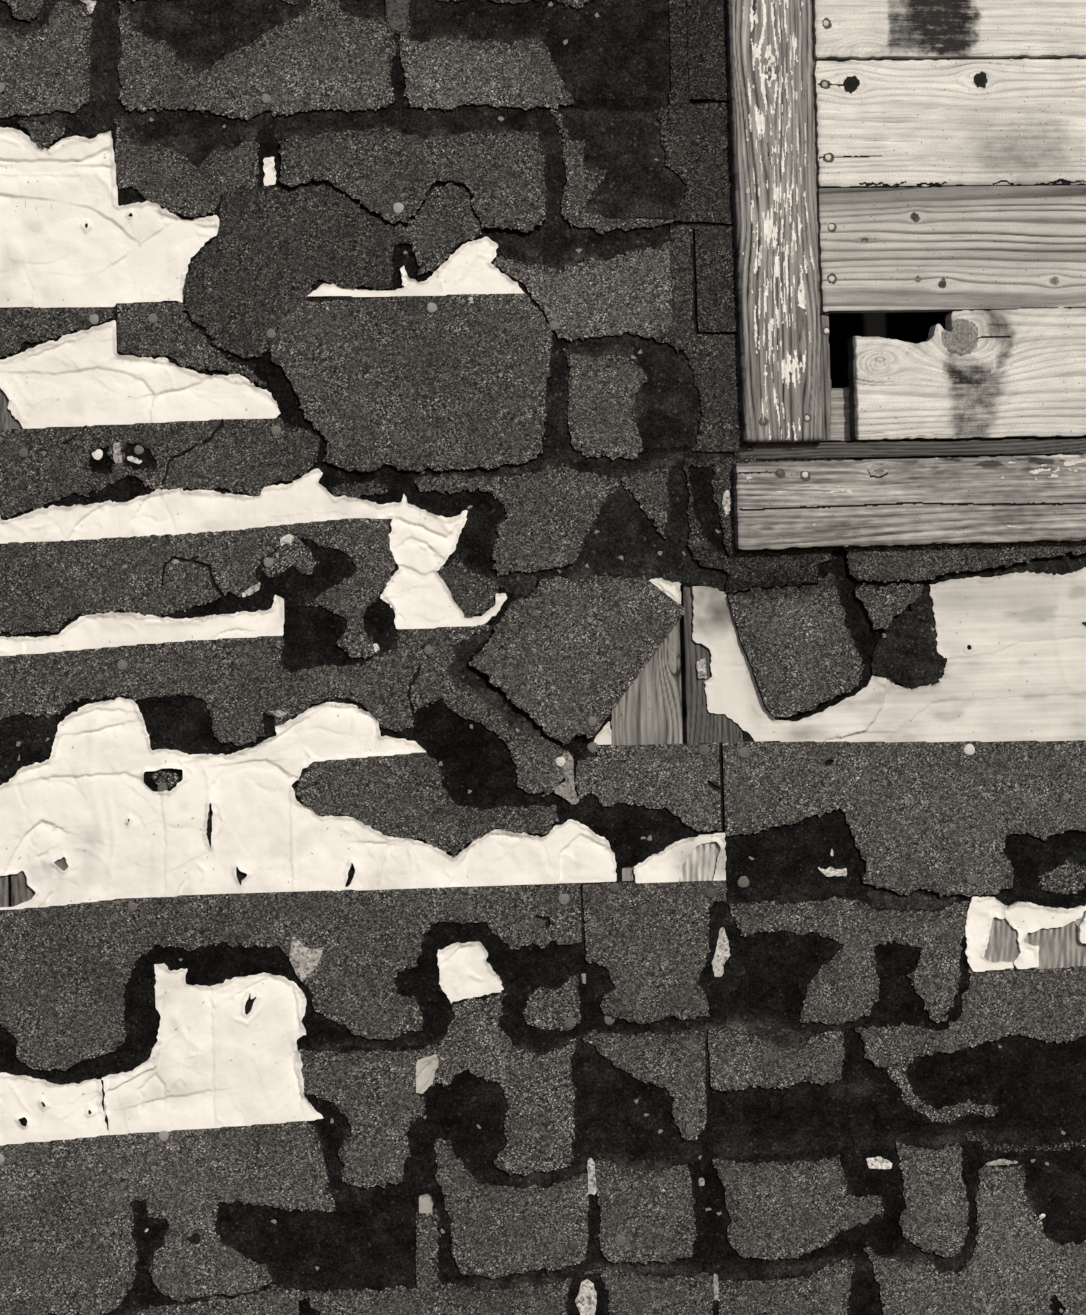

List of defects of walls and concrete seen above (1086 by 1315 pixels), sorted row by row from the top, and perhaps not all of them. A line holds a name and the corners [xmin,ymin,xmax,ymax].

leakage [890,0,978,55]
peeling [742,0,814,441]
leakage [948,323,1011,435]